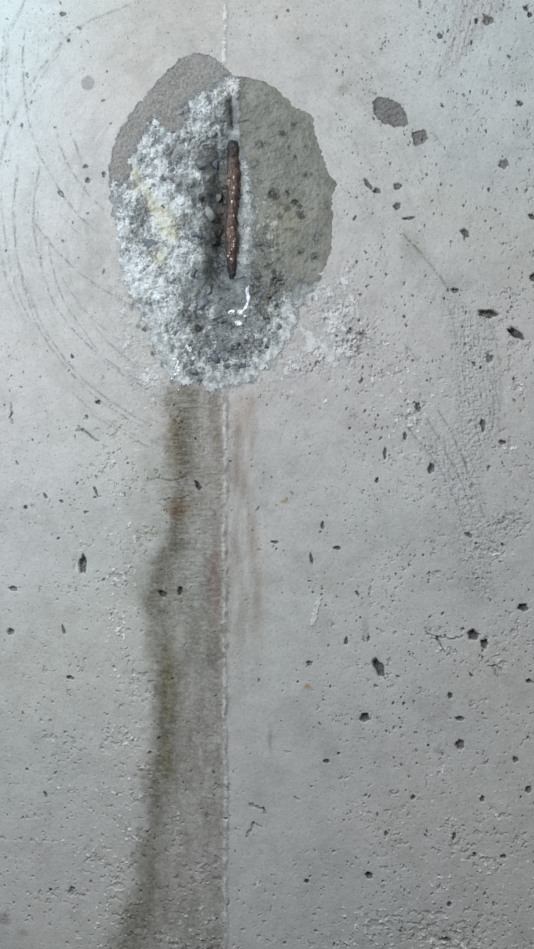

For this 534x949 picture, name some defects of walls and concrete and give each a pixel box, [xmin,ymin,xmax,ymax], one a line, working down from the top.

spalling [108,53,377,407]